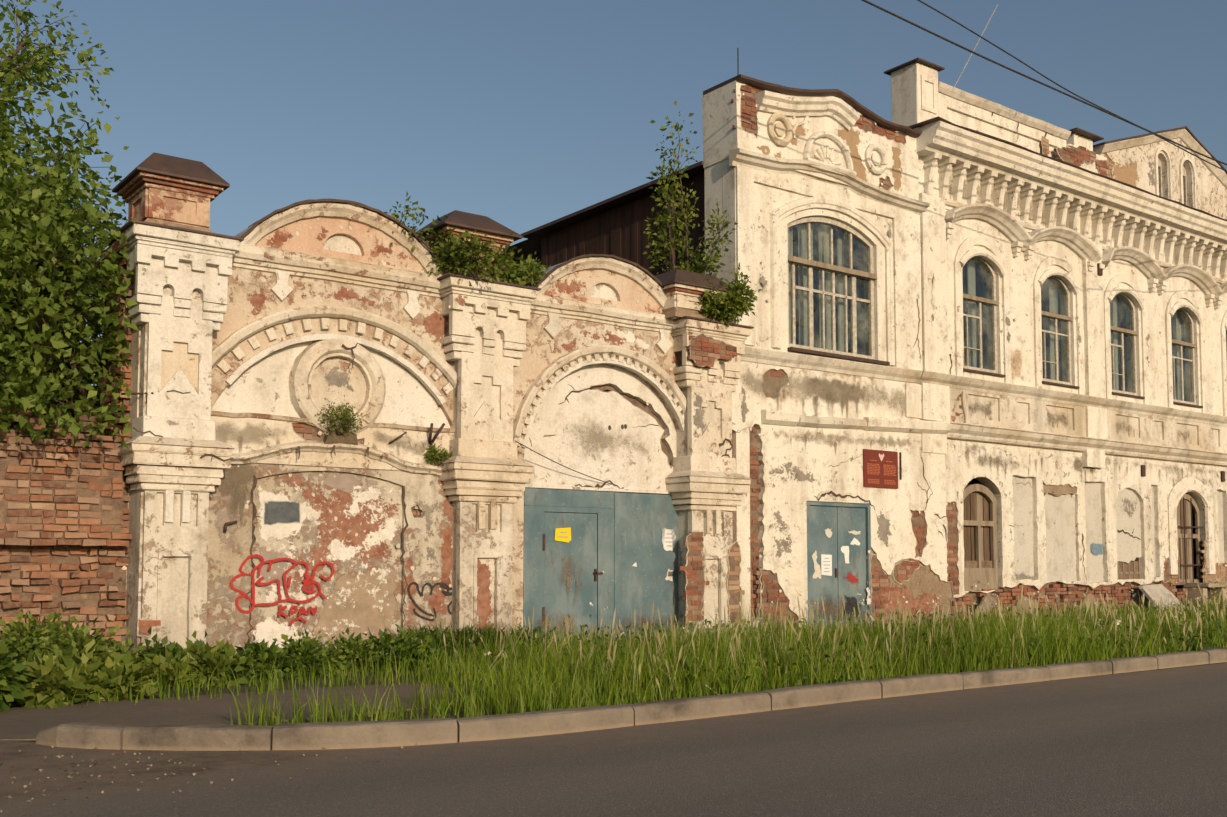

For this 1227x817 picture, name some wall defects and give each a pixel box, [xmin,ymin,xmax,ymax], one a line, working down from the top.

spalling [731,84,785,159]
peeling [838,108,907,191]
spalling [1041,136,1115,178]
peeling [264,218,352,249]
spalling [669,332,737,371]
crack [560,384,590,404]
peeling [693,393,709,442]
spalling [727,368,828,630]
peeling [215,471,453,639]
spalling [679,530,710,623]
flaking render [866,499,1186,632]
spalling [1200,539,1227,583]